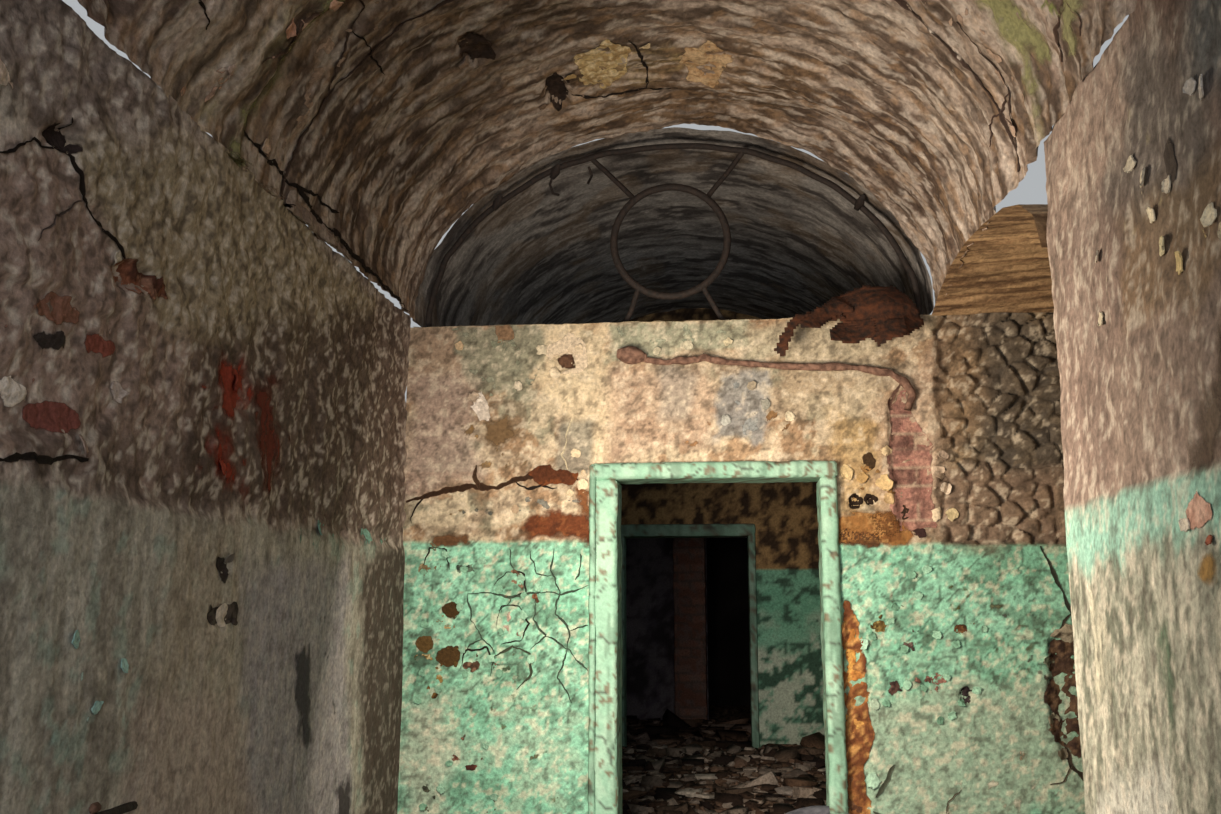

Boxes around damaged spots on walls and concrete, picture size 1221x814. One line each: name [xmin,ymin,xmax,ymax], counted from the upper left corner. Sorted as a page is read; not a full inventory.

crack [894,0,1024,172]
leakage [977,0,1051,94]
leakage [1062,0,1080,56]
crack [0,117,126,261]
crack [243,0,454,312]
peeling [1159,236,1184,275]
peeling [1200,202,1221,240]
crack [0,452,89,465]
corrosion [200,356,290,493]
crack [406,464,578,523]
flaking render [561,418,588,503]
spalling [1043,623,1081,760]